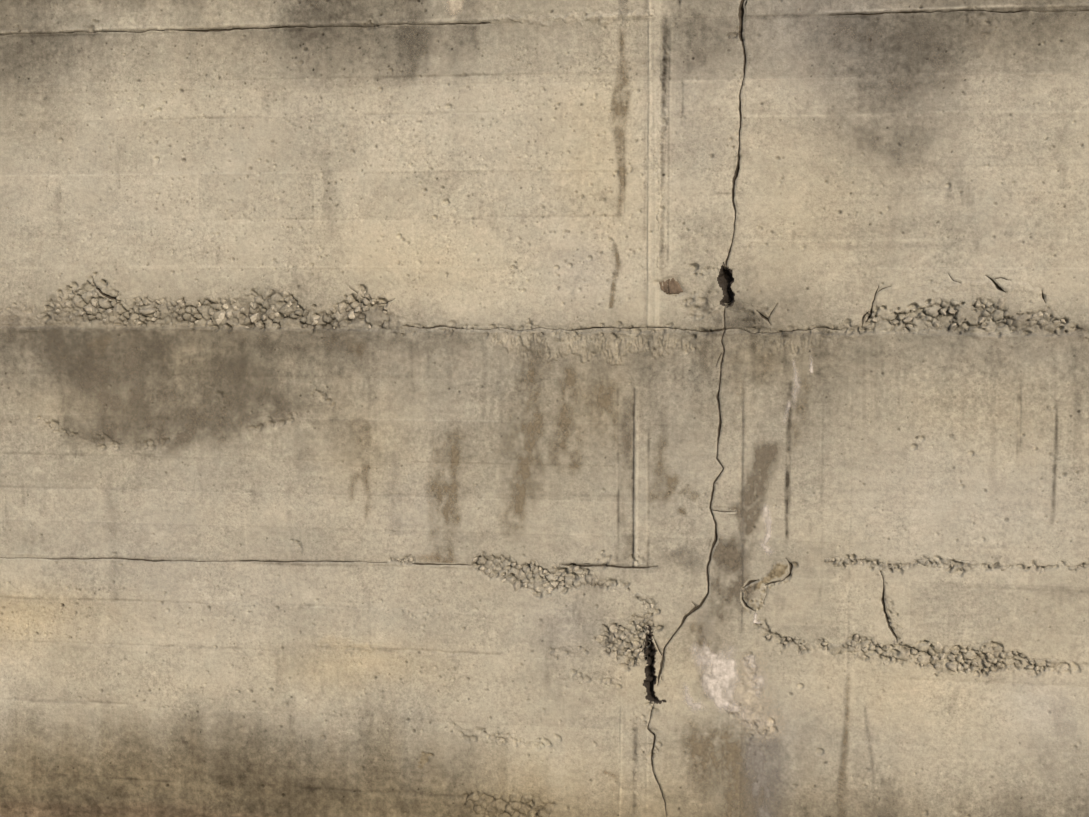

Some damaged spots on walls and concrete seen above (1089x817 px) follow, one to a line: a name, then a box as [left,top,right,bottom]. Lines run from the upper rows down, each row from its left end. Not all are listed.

water stain [448,0,463,14]
spalling [0,5,1089,374]
crack [723,0,748,270]
water stain [77,344,248,449]
water stain [431,438,460,523]
water stain [512,369,543,515]
spalling [470,550,665,692]
crack [348,284,891,817]
crack [880,571,899,642]
spalling [723,554,1089,742]
spalling [461,785,562,817]
water stain [686,646,778,817]